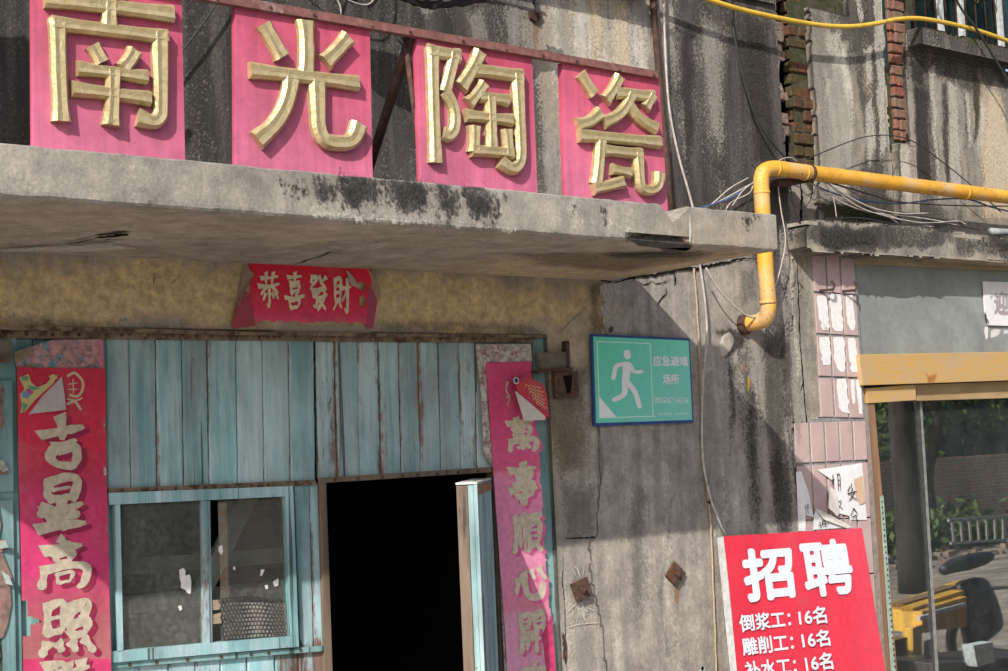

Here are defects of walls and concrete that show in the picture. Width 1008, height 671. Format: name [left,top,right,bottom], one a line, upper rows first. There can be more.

spalling [775,0,844,165]
peeling [856,0,914,175]
water stain [910,57,1008,190]
water stain [279,167,507,229]
water stain [982,201,1008,221]